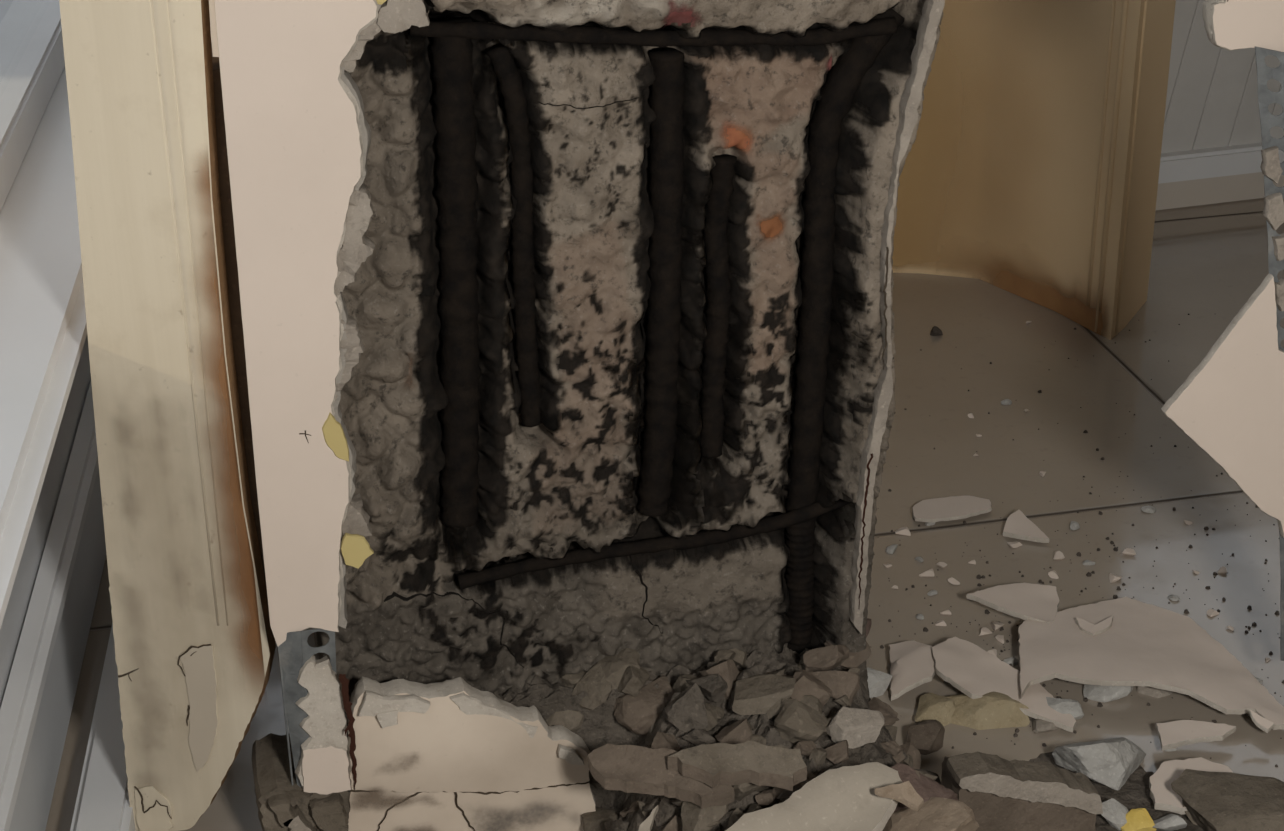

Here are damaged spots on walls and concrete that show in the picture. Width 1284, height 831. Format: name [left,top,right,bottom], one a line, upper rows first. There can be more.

spalling [1202,0,1226,49]
spalling [316,0,943,738]
crack [177,644,212,726]
crack [135,786,172,819]